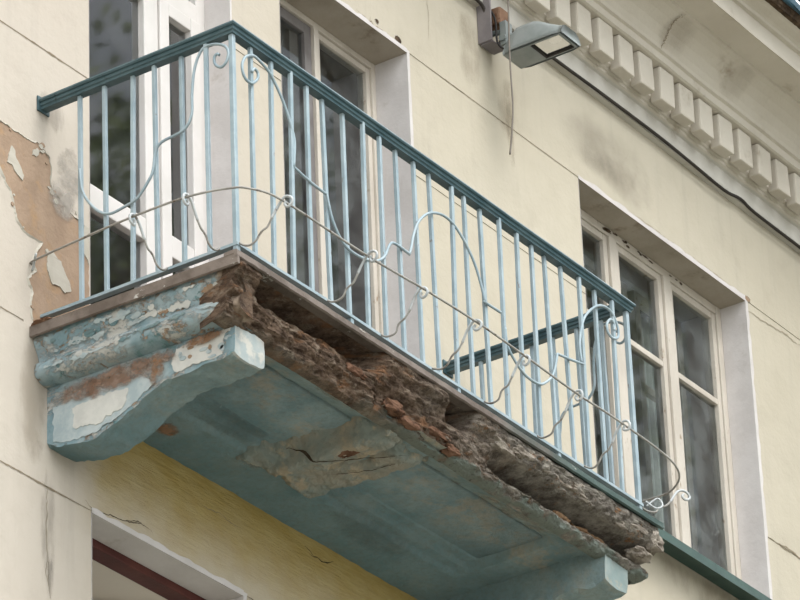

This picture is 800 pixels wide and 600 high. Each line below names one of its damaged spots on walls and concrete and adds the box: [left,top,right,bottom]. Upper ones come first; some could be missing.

flaking render [0,120,90,321]
crack [0,460,149,598]
crack [287,448,404,475]
spalling [43,260,664,585]